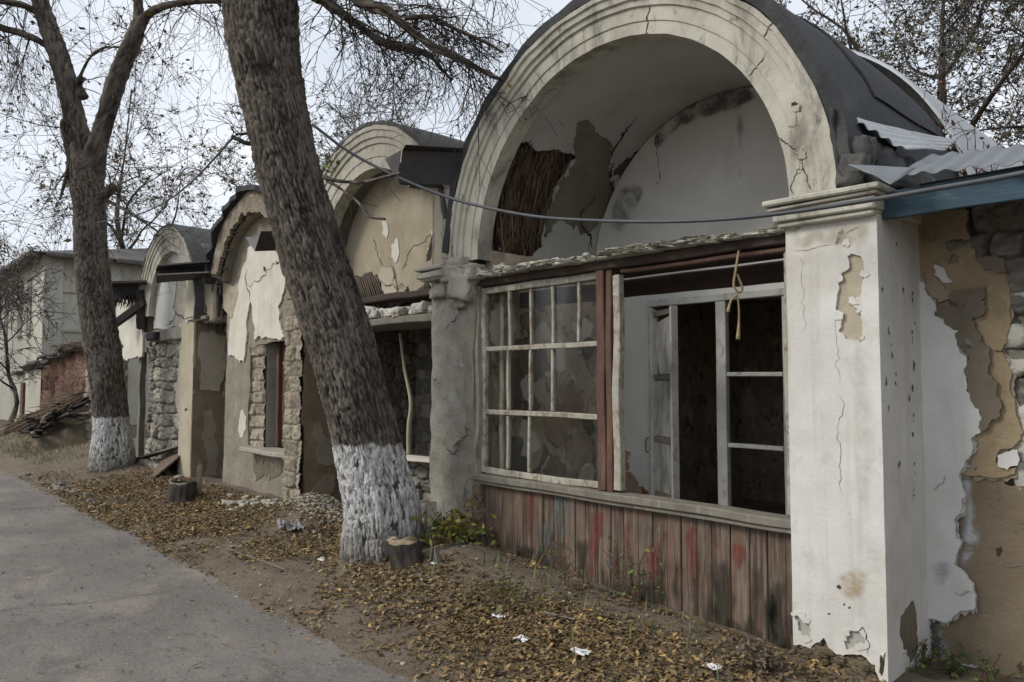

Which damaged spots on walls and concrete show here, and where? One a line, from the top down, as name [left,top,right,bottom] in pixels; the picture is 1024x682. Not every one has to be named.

peeling [494,120,638,257]
crack [580,117,637,249]
crack [778,113,810,193]
peeling [196,193,287,392]
peeling [354,220,431,308]
crack [373,228,452,289]
peeling [831,227,870,342]
peeling [900,208,1024,663]
spalling [791,611,886,682]